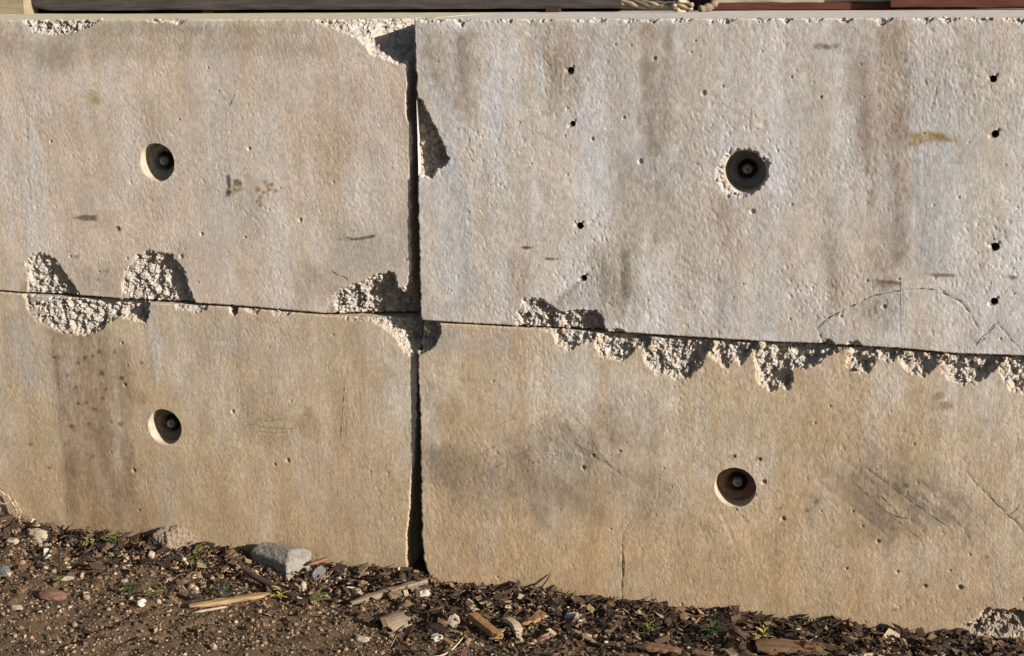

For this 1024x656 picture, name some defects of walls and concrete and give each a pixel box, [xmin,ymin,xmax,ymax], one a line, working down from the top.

spalling [308,18,513,66]
spalling [418,98,450,178]
spalling [23,249,213,336]
spalling [325,269,443,359]
spalling [513,297,1024,394]
spalling [956,607,1024,638]